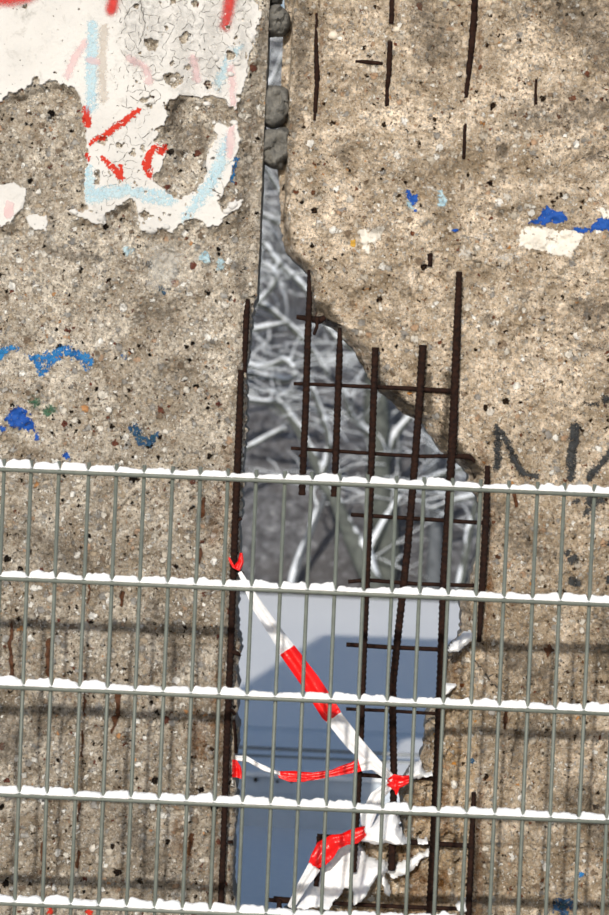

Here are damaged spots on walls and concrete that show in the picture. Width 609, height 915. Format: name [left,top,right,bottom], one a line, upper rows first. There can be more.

spalling [0,0,270,915]
crack [94,0,251,210]
spalling [269,0,609,915]